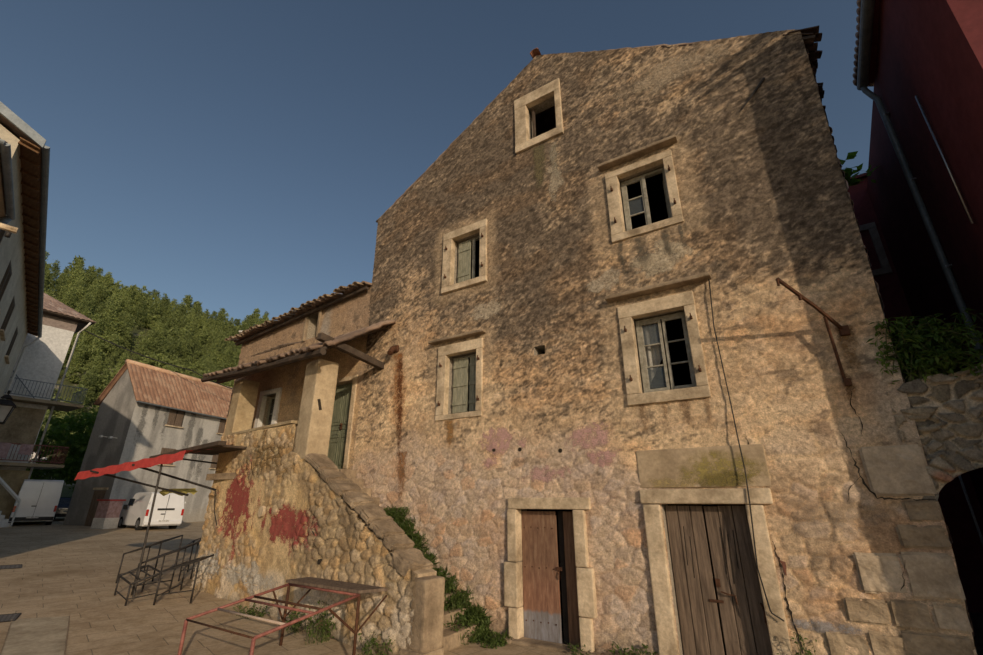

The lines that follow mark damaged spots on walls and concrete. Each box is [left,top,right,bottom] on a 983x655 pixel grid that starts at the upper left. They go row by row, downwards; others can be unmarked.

crack [841,391,936,502]
crack [772,541,803,654]